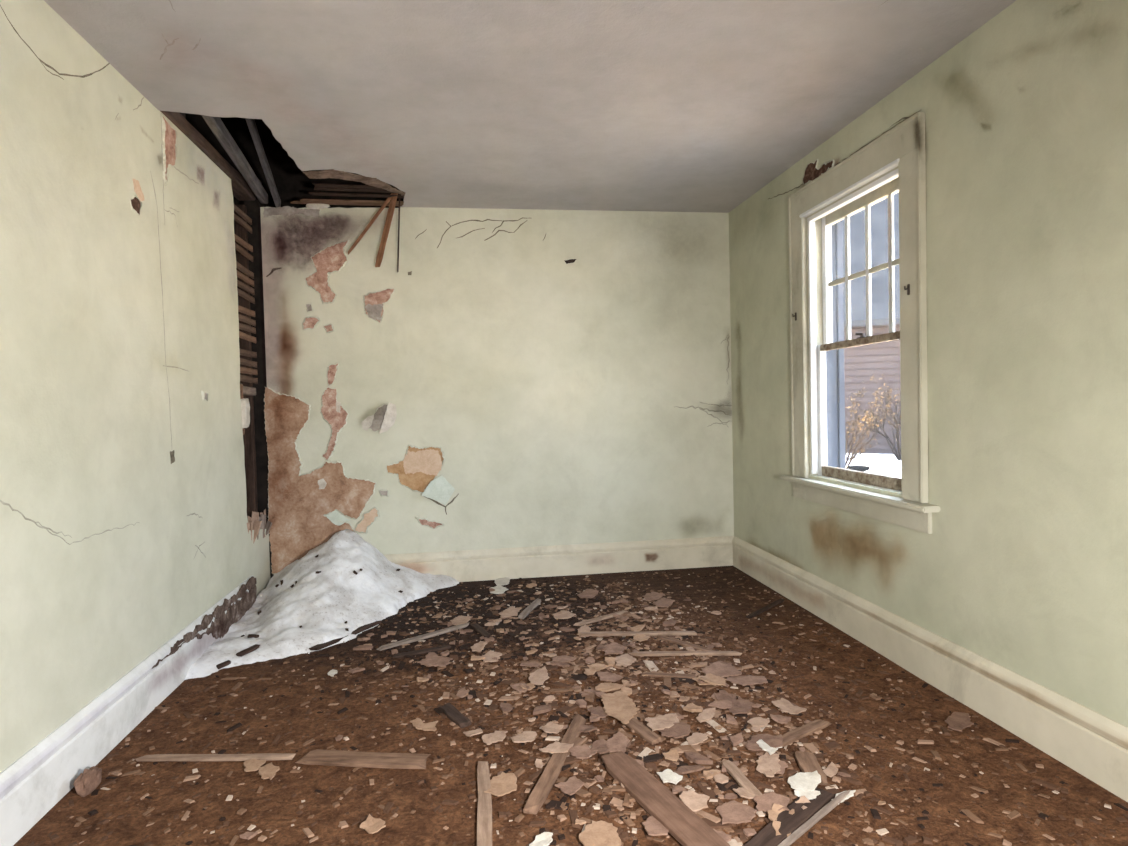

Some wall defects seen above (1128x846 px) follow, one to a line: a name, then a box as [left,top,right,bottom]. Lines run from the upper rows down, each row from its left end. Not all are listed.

crack [0,5,110,80]
flaking render [161,114,177,187]
crack [415,218,546,248]
crack [675,334,732,427]
flaking render [152,196,455,669]
crack [0,500,139,545]